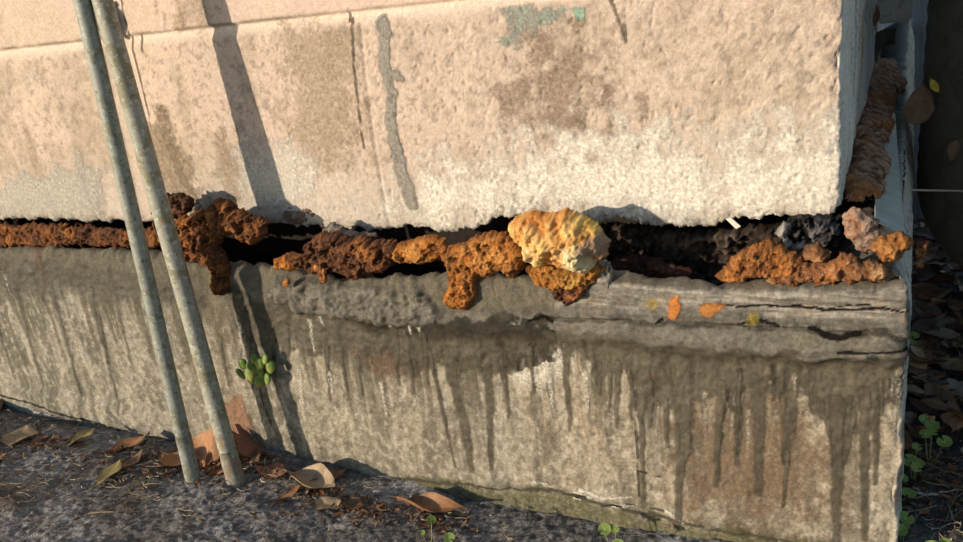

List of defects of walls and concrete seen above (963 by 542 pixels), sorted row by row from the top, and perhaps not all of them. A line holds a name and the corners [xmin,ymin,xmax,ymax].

crack [347,11,417,209]
spalling [634,216,709,227]
damp [0,265,138,428]
crack [527,315,554,324]
rust [648,296,681,320]
rust [698,303,725,317]
crack [725,282,911,378]
damp [229,290,904,542]